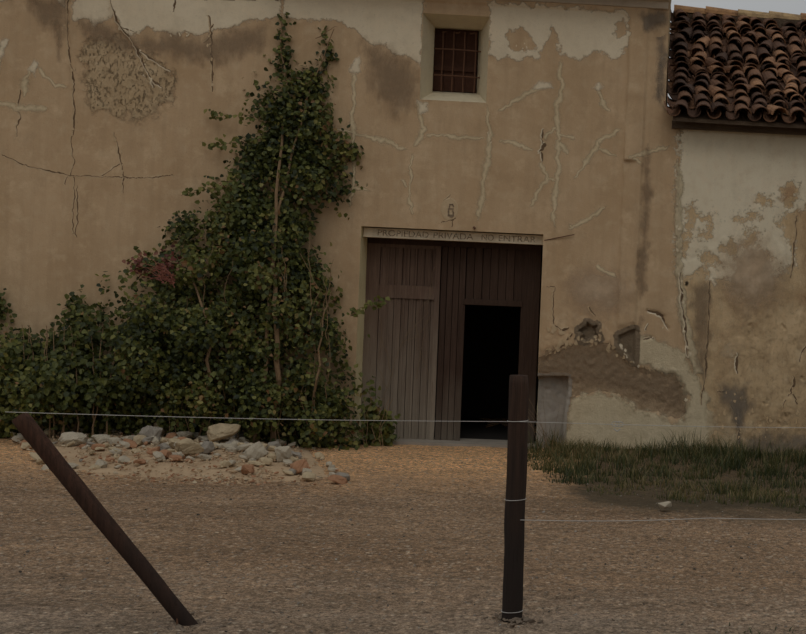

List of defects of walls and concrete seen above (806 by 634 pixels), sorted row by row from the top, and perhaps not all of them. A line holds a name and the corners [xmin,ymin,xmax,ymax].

crack [0,0,173,237]
peeling [72,0,424,121]
peeling [488,0,631,62]
peeling [536,129,806,452]
crack [789,215,798,278]
crack [782,343,806,408]